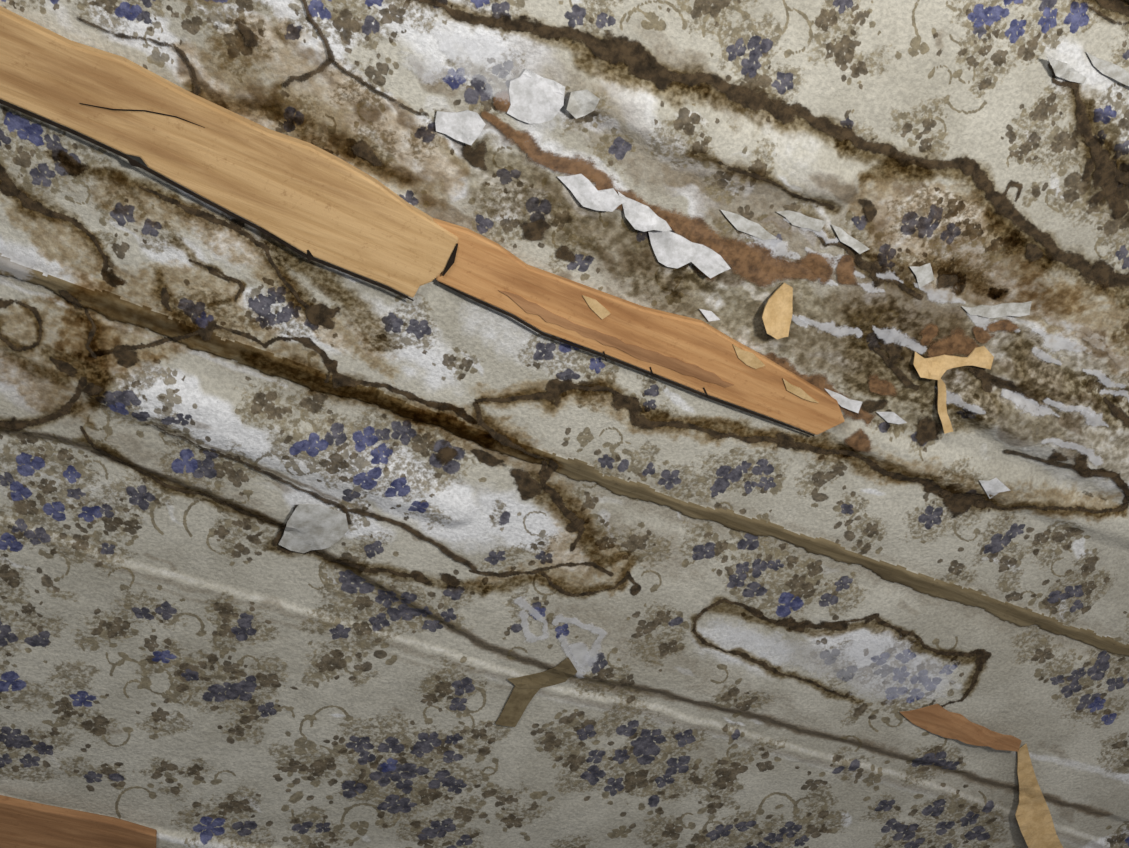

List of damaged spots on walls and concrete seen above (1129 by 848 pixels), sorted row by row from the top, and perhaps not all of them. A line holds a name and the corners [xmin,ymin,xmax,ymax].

crack [77,17,201,95]
water stain [191,84,411,182]
peeling [435,110,486,145]
peeling [507,68,600,124]
water stain [416,0,1129,308]
water stain [0,165,126,287]
water stain [51,150,391,351]
peeling [557,174,731,279]
peeling [776,210,869,254]
water stain [0,272,1129,597]
crack [145,423,477,571]
peeling [279,504,349,553]